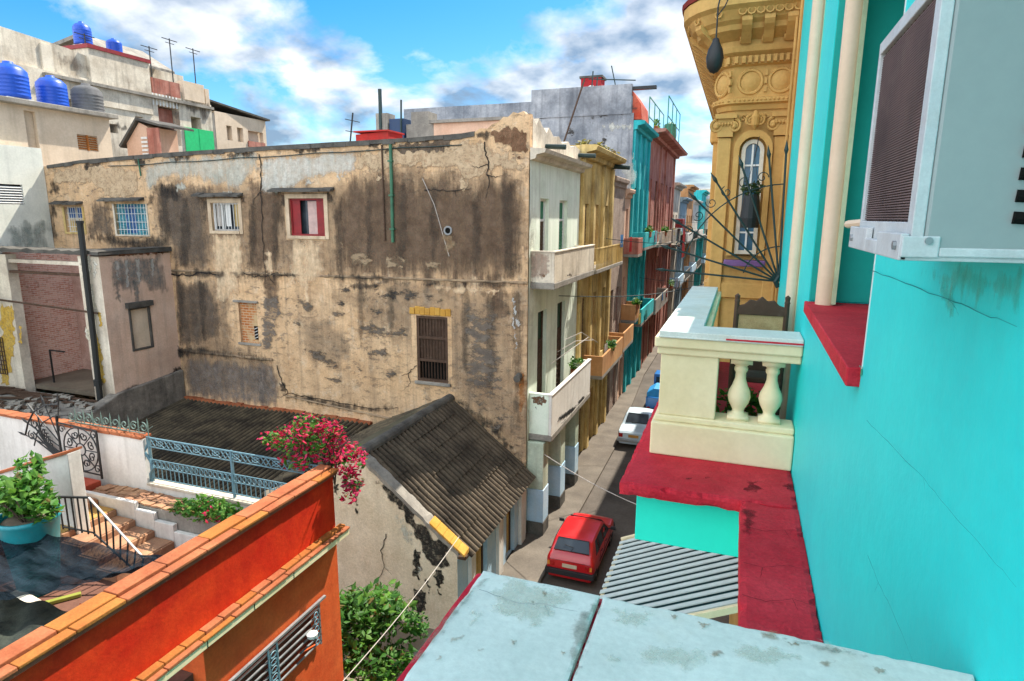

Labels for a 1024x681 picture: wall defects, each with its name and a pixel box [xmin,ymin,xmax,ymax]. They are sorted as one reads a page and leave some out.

flaking render [52,126,528,198]
crack [424,142,499,196]
crack [171,154,292,287]
flaking render [0,305,22,385]
water stain [88,174,548,448]
crack [870,270,1017,327]